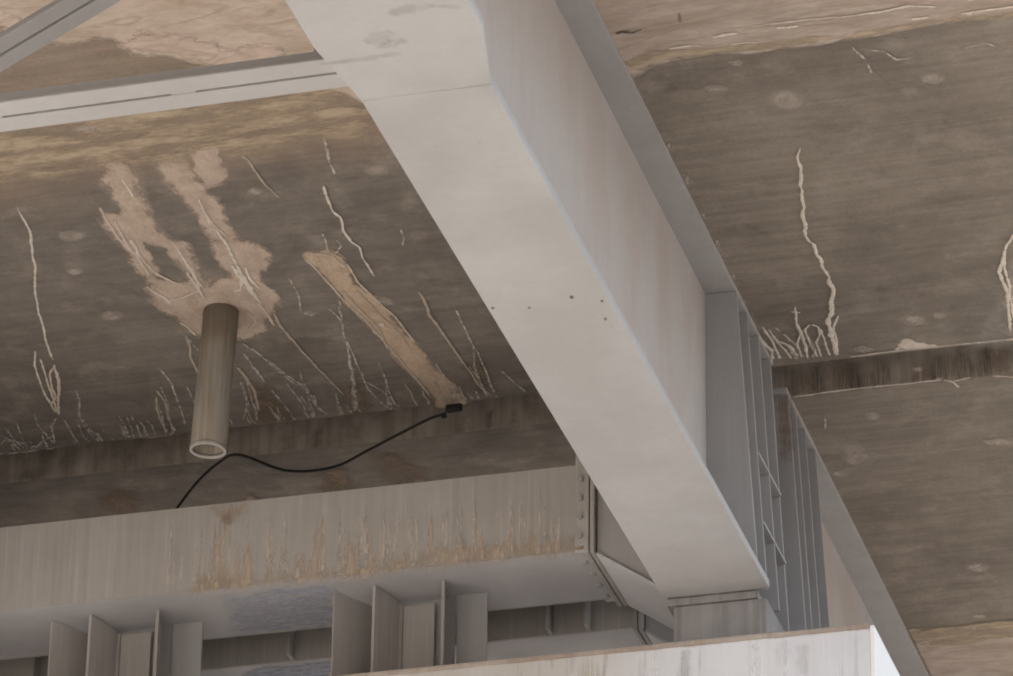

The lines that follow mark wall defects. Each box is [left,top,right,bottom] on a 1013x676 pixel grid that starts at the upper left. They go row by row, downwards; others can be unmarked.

crack [0,209,114,454]
leakage [119,387,176,438]
crack [141,335,199,438]
crack [241,156,279,198]
crack [237,278,402,422]
crack [322,137,375,277]
crack [418,292,526,398]
crack [760,149,839,360]
crack [793,375,1013,397]
crack [997,234,1013,333]